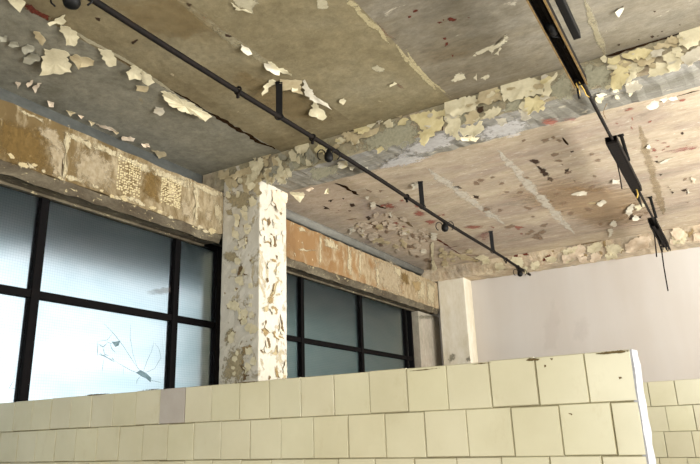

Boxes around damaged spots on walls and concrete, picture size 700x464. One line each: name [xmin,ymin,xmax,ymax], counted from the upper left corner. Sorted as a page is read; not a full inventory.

peeling [8,0,26,12]
peeling [232,0,258,13]
peeling [7,153,46,173]
peeling [0,15,116,93]
peeling [66,110,166,158]
peeling [126,65,155,92]
peeling [153,91,212,121]
crack [163,87,275,149]
peeling [261,62,332,121]
peeling [582,27,700,103]
peeling [218,72,573,384]
peeling [324,188,651,274]